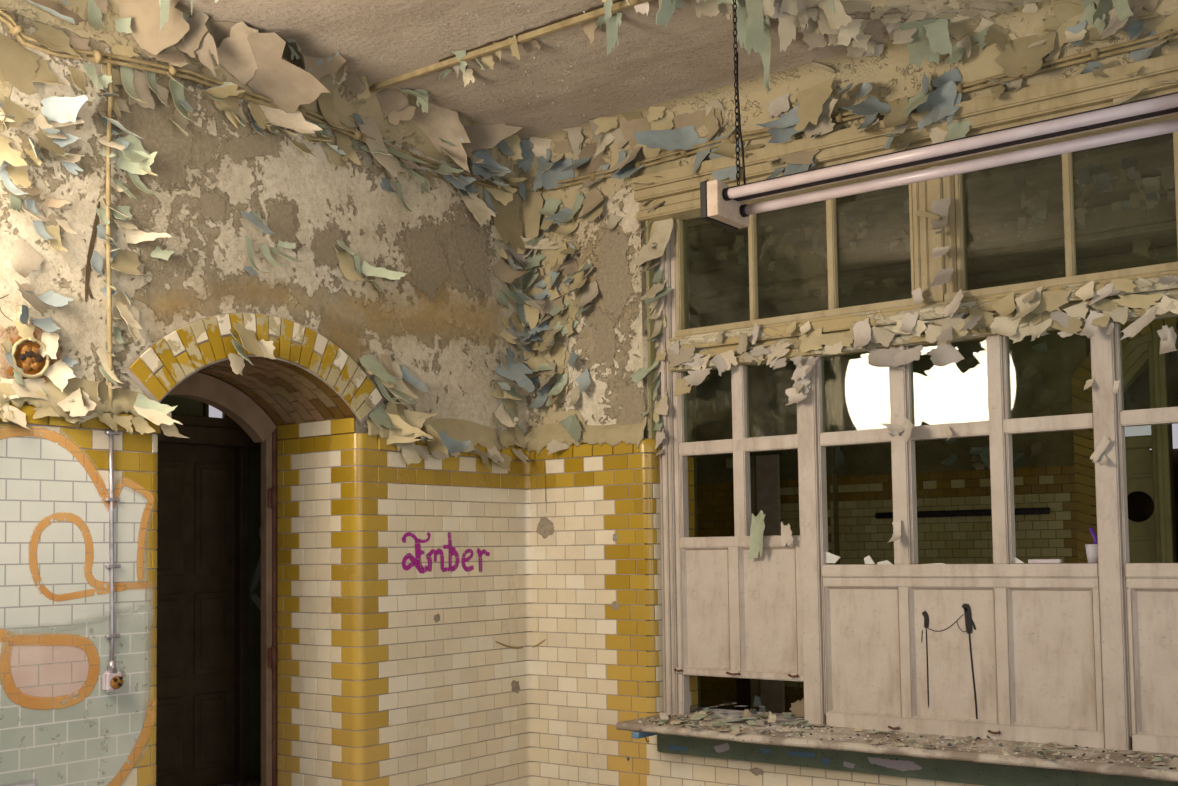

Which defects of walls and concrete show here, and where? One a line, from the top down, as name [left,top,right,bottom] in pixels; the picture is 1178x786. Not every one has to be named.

corrosion [1,324,59,382]
spalling [536,517,554,539]
peeling [748,510,766,559]
peeling [781,522,794,546]
peeling [888,520,901,542]